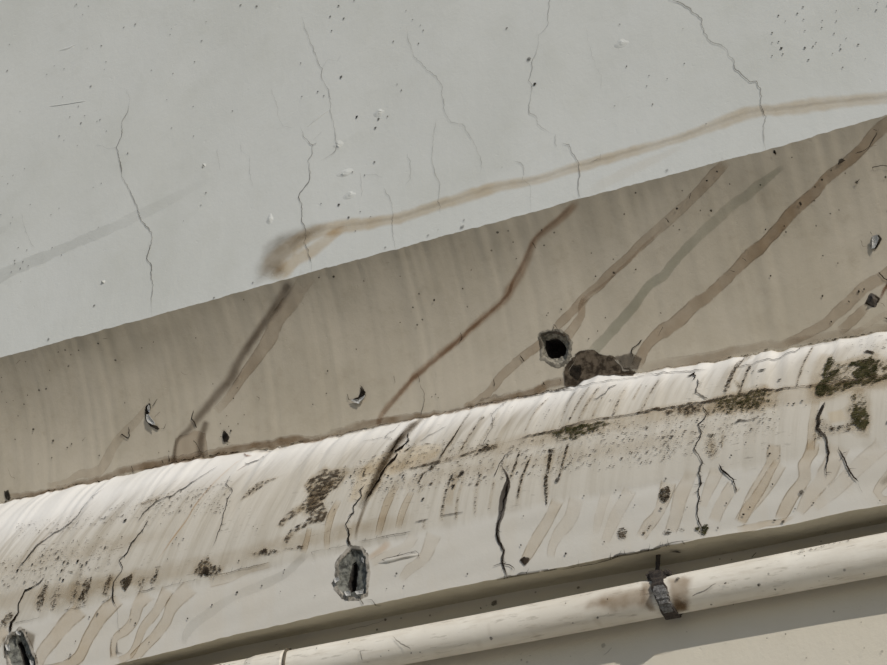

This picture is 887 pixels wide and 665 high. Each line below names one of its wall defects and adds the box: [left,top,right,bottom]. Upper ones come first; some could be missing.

hole [545,338,567,359]
damp [148,413,436,469]
damp [253,332,887,555]
crack [529,340,737,529]
crack [345,422,410,545]
crack [494,450,684,579]
crack [9,582,40,632]
mould [0,513,123,611]
mould [103,569,159,595]
mould [194,555,221,576]
hole [349,562,359,593]
hole [18,642,30,665]